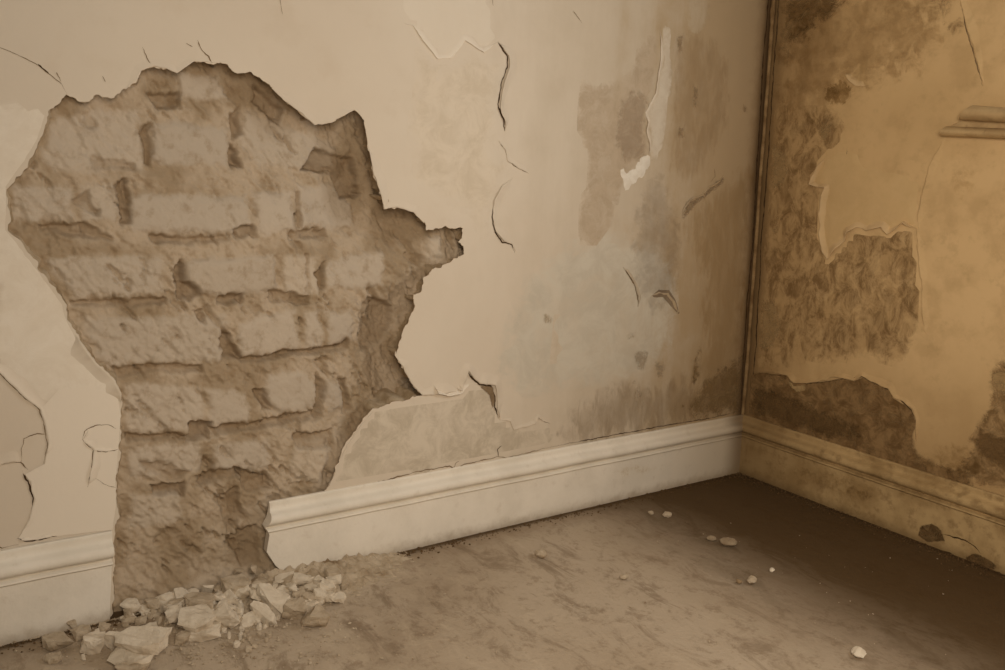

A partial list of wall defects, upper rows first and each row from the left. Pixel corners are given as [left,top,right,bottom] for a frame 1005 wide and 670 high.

crack [2,48,65,90]
spalling [0,42,555,612]
crack [382,0,779,481]
water stain [495,35,680,399]
peeling [620,26,672,190]
peeling [749,95,970,485]
water stain [963,363,1005,487]